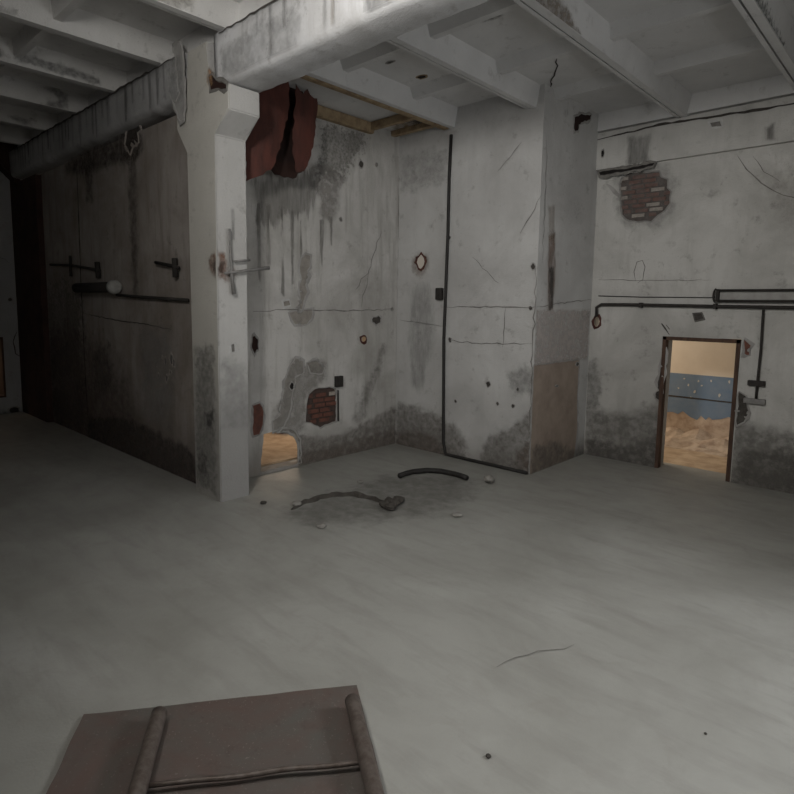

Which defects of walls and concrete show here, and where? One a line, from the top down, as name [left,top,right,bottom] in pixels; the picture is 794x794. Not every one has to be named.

damp [257,124,368,247]
flaking render [598,160,672,223]
peeling [250,356,326,464]
flaking render [305,386,338,429]
damp [299,406,464,465]
damp [484,411,658,474]